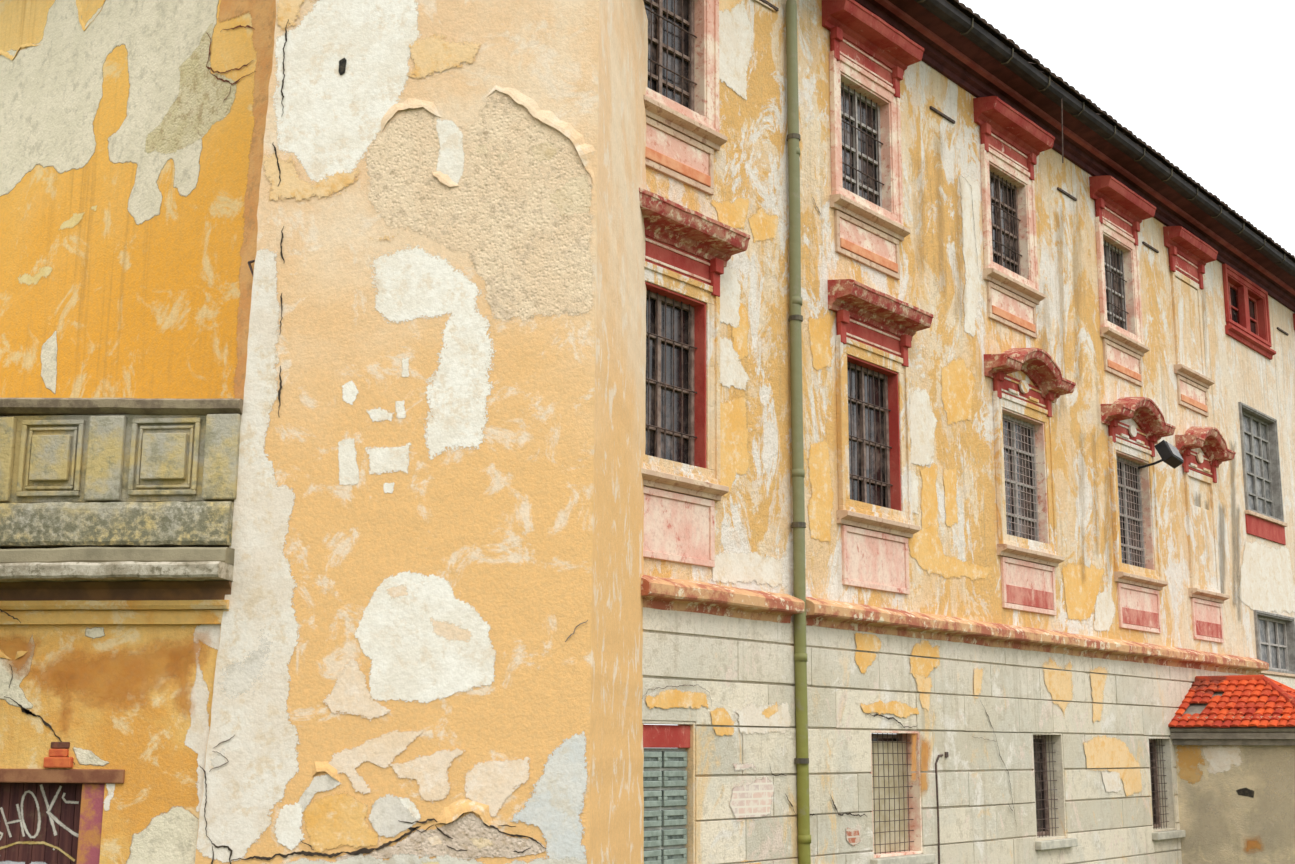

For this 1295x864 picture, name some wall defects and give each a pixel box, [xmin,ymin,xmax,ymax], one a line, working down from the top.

crack [206,19,289,115]
crack [272,144,281,186]
crack [278,226,286,262]
crack [276,366,284,416]
flaking render [0,0,595,864]
crack [4,664,109,766]
crack [200,735,546,864]
peeling [1101,771,1121,792]